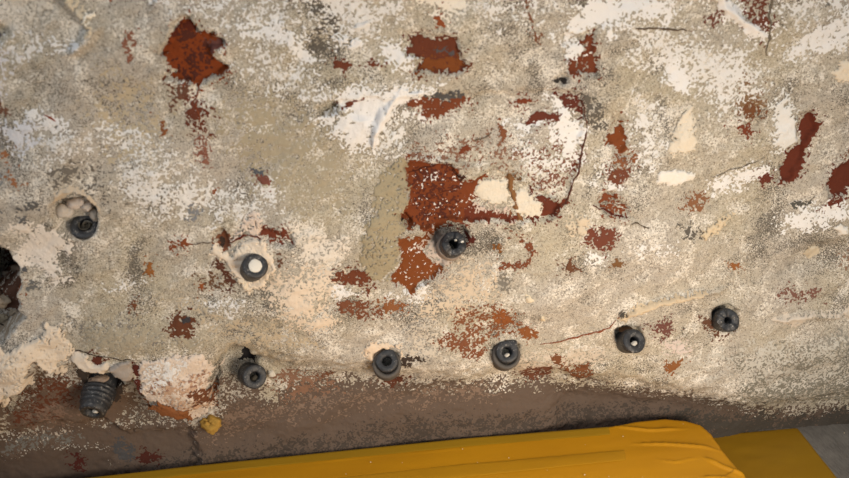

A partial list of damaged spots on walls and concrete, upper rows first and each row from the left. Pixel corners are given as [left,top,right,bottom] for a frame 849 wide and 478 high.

rust [167,25,220,84]
rust [409,47,467,79]
rust [184,93,221,169]
flaking render [391,107,641,298]
flaking render [159,303,200,342]
leakage [199,295,253,320]
flaking render [328,261,384,326]
rust [425,300,539,353]
peeling [0,322,225,424]
leakage [0,311,849,478]